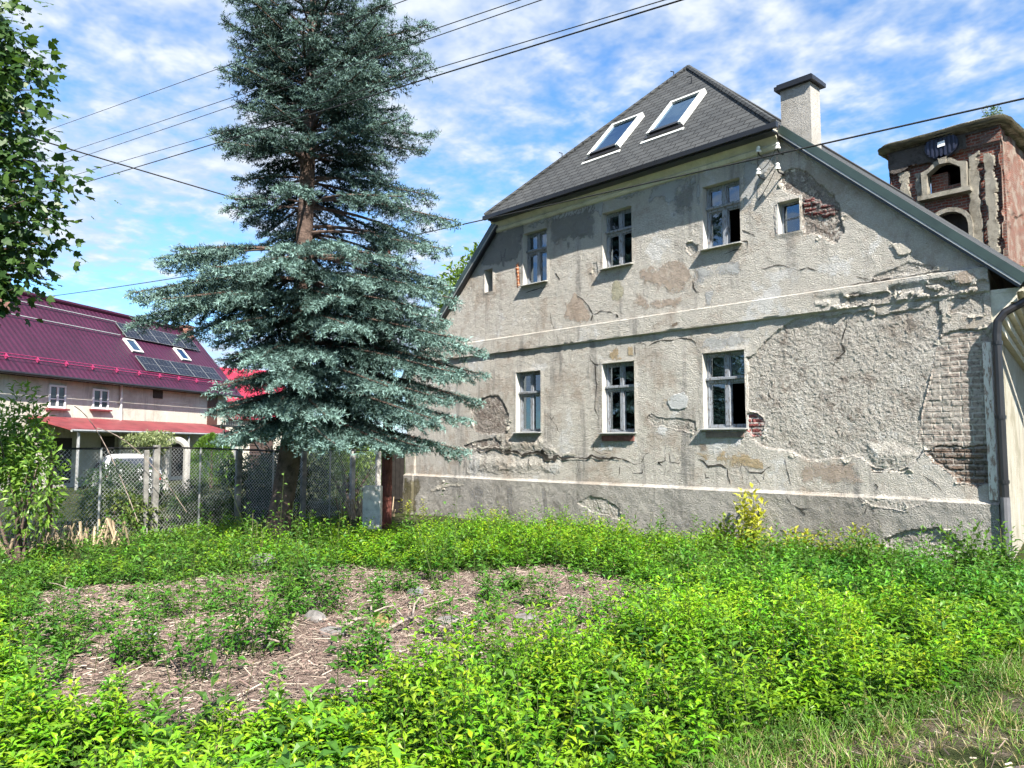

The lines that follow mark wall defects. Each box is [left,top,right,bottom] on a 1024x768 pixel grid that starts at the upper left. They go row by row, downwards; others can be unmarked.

flaking render [777,168,847,244]
crack [833,322,847,367]
spalling [745,243,992,487]
spalling [464,395,512,453]
spalling [577,495,622,520]
crack [470,416,823,535]